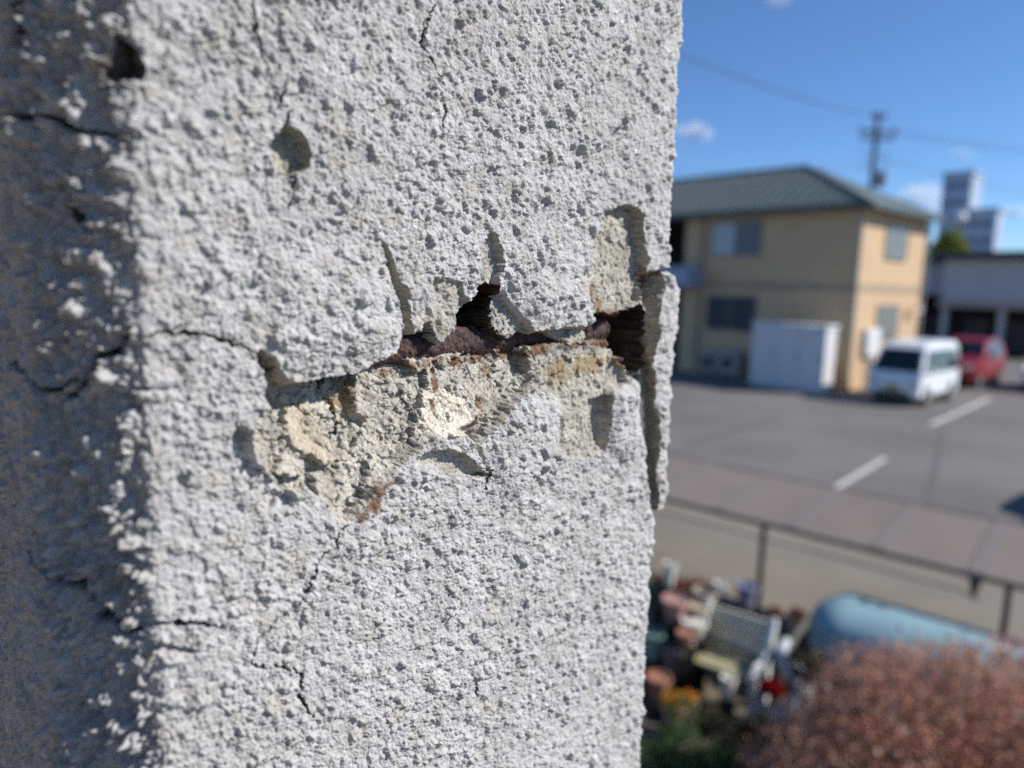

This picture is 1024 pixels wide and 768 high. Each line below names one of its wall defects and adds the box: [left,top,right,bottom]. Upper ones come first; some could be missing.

crack [418,5,448,129]
crack [0,111,136,137]
crack [13,328,255,398]
spalling [230,203,671,525]
corrosion [370,317,625,381]